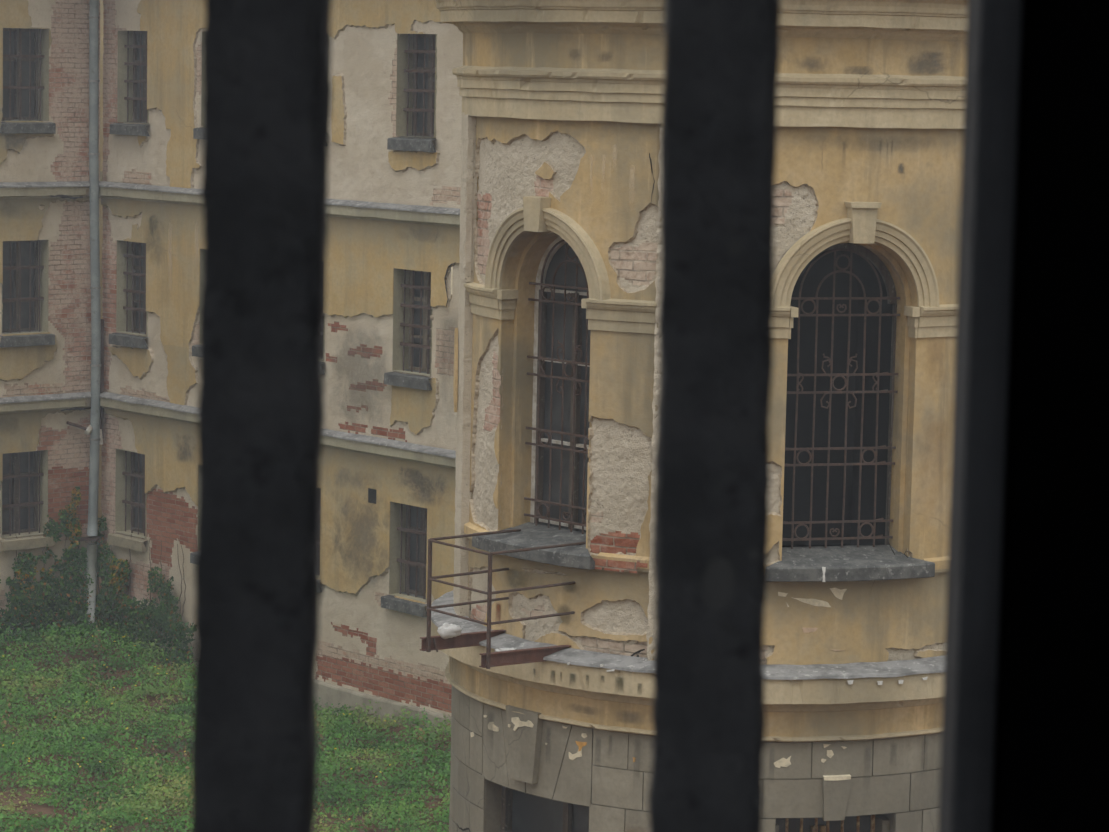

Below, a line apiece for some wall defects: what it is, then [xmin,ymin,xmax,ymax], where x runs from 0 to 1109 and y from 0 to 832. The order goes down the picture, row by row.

flaking render [0,0,171,186]
flaking render [190,28,205,189]
flaking render [327,20,463,209]
flaking render [0,198,170,402]
flaking render [184,306,200,407]
flaking render [322,263,459,451]
flaking render [468,131,661,672]
flaking render [774,181,819,271]
flaking render [0,409,198,667]
flaking render [315,567,452,716]
peeling [774,756,791,768]
spalling [821,744,851,781]